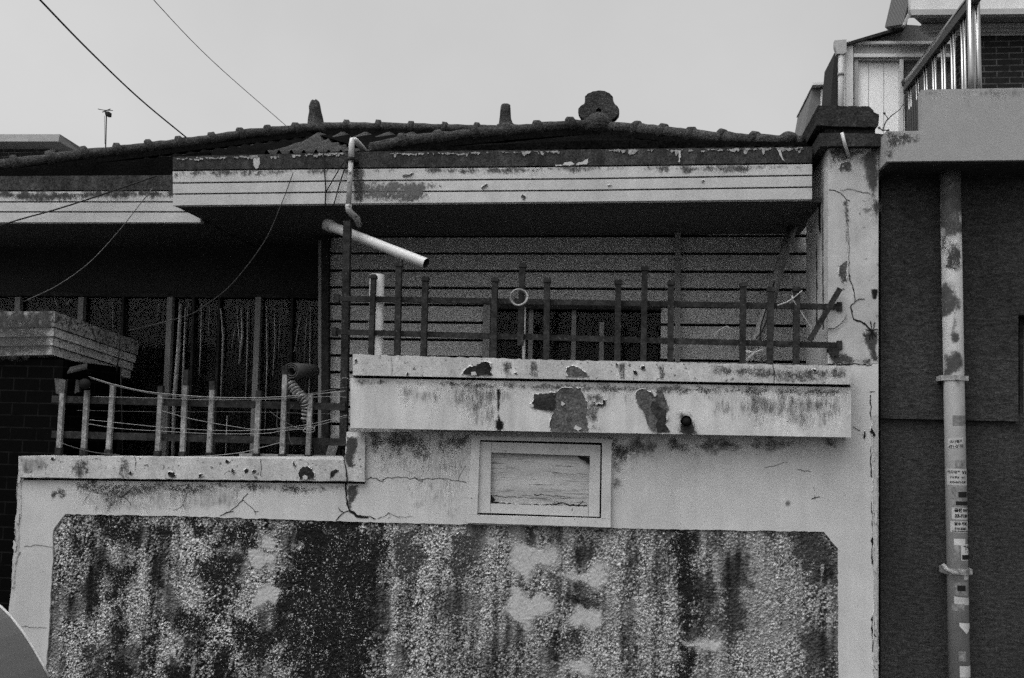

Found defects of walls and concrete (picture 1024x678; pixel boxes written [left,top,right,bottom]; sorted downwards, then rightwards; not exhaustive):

water stain [307,164,609,202]
peeling [503,151,588,166]
peeling [667,147,803,162]
crack [828,189,878,366]
peeling [461,361,492,377]
peeling [529,365,607,433]
peeling [635,388,670,434]
water stain [442,331,878,430]
crack [220,459,262,516]
crack [336,449,466,520]
water stain [79,516,429,678]
water stain [665,529,701,678]